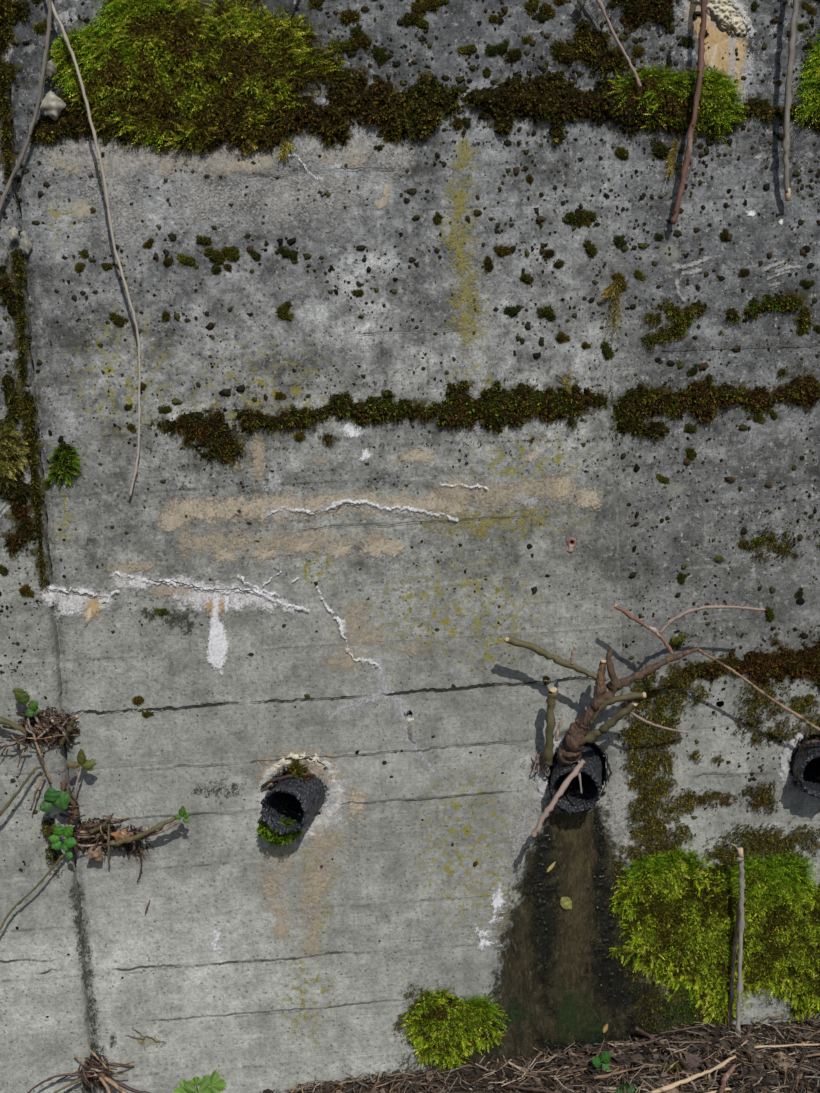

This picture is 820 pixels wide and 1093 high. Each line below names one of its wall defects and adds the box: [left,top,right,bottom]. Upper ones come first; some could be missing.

water stain [158,440,601,567]
water stain [399,788,713,1074]